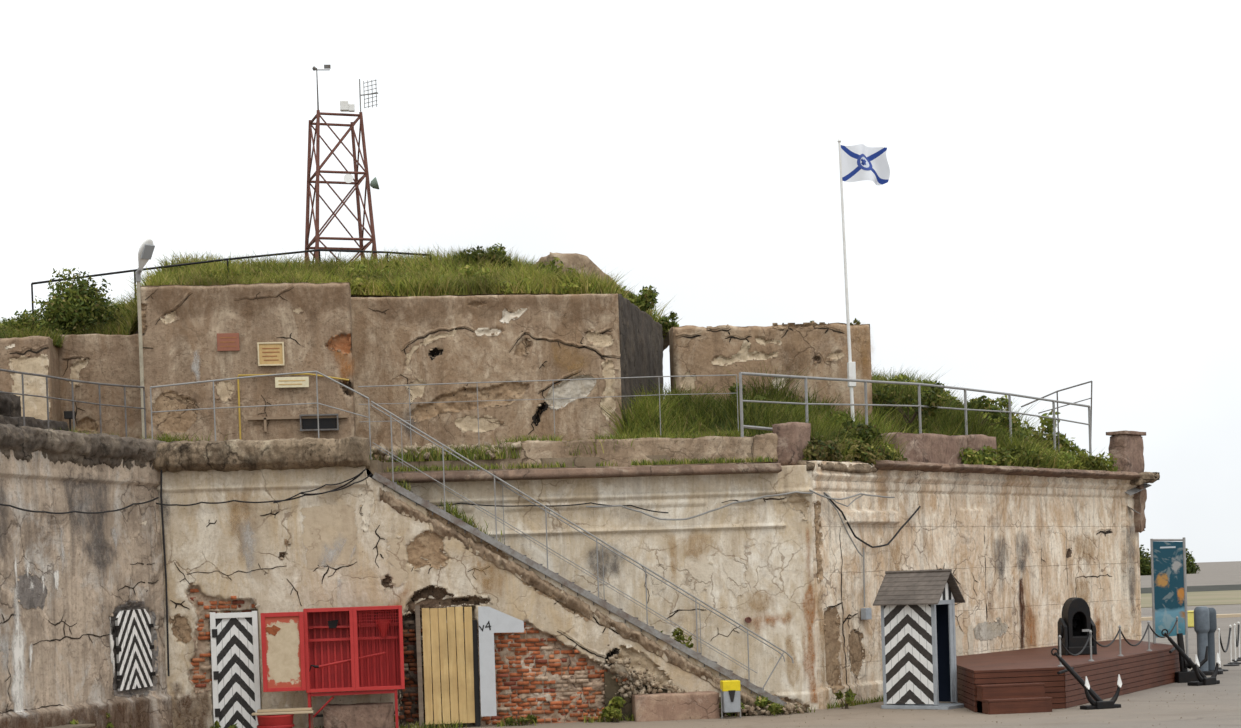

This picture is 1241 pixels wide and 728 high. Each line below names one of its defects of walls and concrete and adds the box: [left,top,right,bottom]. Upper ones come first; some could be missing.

spalling [326,334,351,355]
spalling [403,329,531,433]
crack [400,324,621,435]
spalling [532,328,619,426]
spalling [712,322,829,366]
spalling [812,351,845,364]
flaking render [109,582,260,698]
crack [118,494,507,616]
flaking render [381,575,493,727]
spalling [387,508,594,622]
flaking render [477,619,674,726]
crack [936,528,988,648]